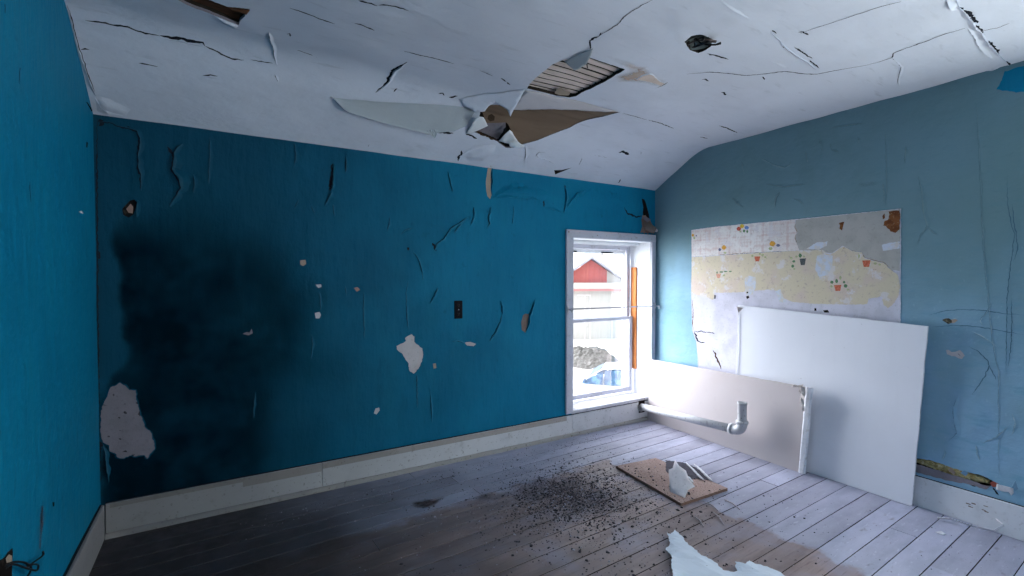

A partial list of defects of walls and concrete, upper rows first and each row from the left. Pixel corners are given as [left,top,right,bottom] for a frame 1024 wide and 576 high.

crack [85,20,270,76]
crack [291,1,409,31]
crack [376,51,453,94]
spalling [459,49,619,148]
crack [589,2,648,49]
crack [692,24,1007,95]
spalling [122,200,141,218]
peeling [396,281,436,408]
peeling [521,299,536,333]
crack [692,302,721,369]
peeling [99,382,156,482]
spalling [916,459,1018,495]